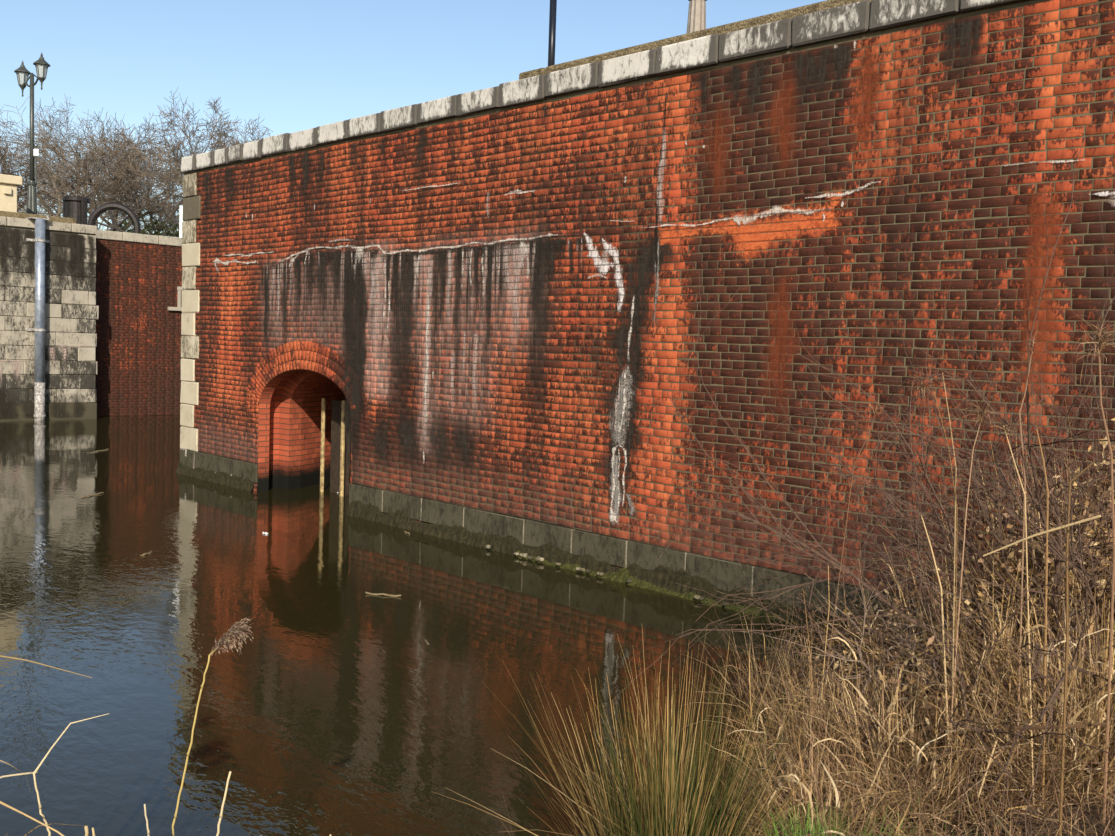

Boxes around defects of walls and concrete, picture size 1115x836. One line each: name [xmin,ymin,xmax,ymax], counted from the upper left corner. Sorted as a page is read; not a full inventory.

leakage [0,228,35,285]
leakage [55,233,94,279]
leakage [262,233,673,507]
leakage [0,392,34,419]